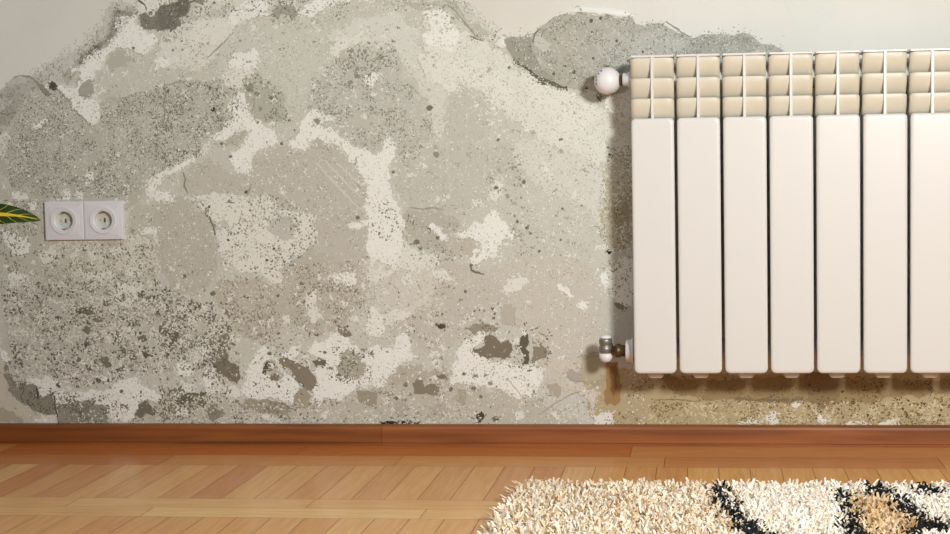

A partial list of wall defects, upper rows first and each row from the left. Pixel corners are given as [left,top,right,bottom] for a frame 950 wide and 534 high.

flaking render [0,0,784,425]
leakage [0,0,950,425]
corrosion [604,362,622,406]